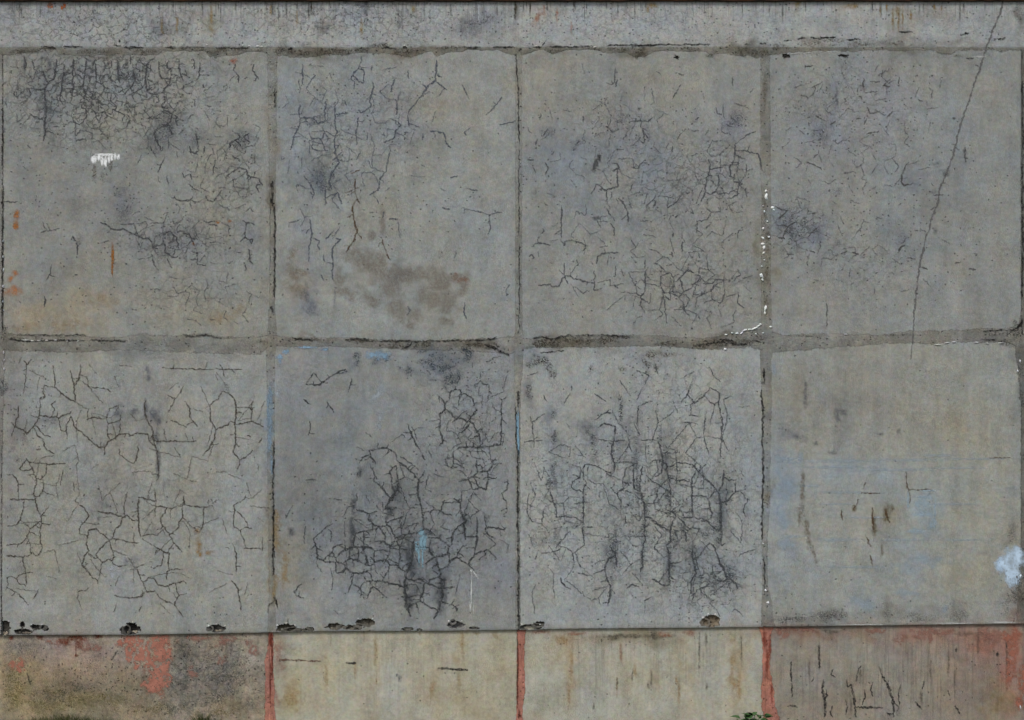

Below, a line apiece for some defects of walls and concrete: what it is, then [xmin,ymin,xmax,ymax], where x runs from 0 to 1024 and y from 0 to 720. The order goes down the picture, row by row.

crack [760,1,1006,356]
crack [985,81,1024,342]
crack [1,40,766,630]
spalling [0,616,60,645]
peeling [187,623,257,664]
spalling [447,619,479,630]
spalling [519,621,544,630]
spalling [699,613,721,627]